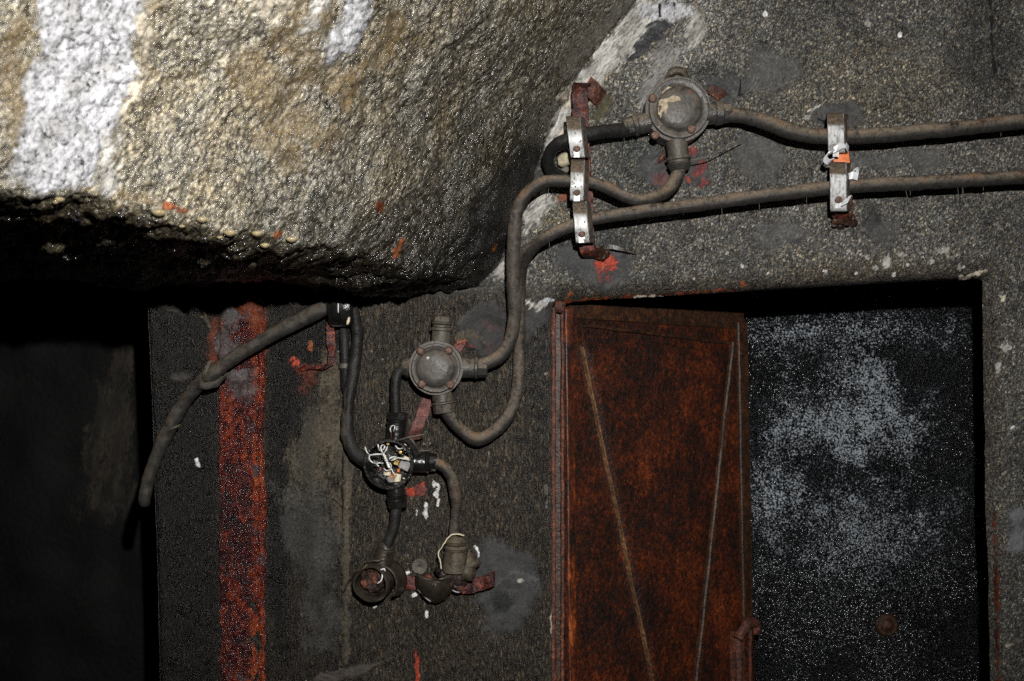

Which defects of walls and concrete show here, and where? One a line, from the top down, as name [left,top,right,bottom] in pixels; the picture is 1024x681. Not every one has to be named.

rust [216,283,266,334]
water stain [746,301,973,607]